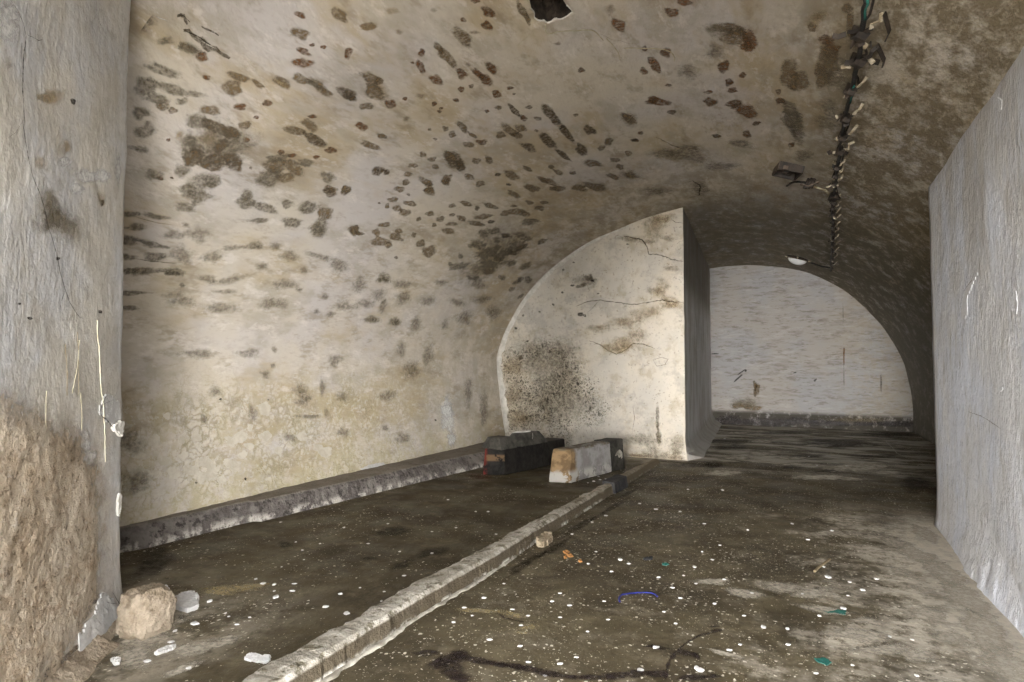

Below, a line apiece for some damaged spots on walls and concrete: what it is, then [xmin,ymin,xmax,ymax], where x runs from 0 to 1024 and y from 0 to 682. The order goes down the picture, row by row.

water stain [332,8,347,22]
water stain [291,28,309,40]
water stain [453,27,476,46]
water stain [434,43,469,67]
water stain [222,72,332,96]
water stain [131,63,250,211]
water stain [237,155,351,237]
water stain [349,104,638,316]
water stain [123,212,186,302]
crack [624,236,682,262]
crack [578,300,683,312]
water stain [501,340,608,444]